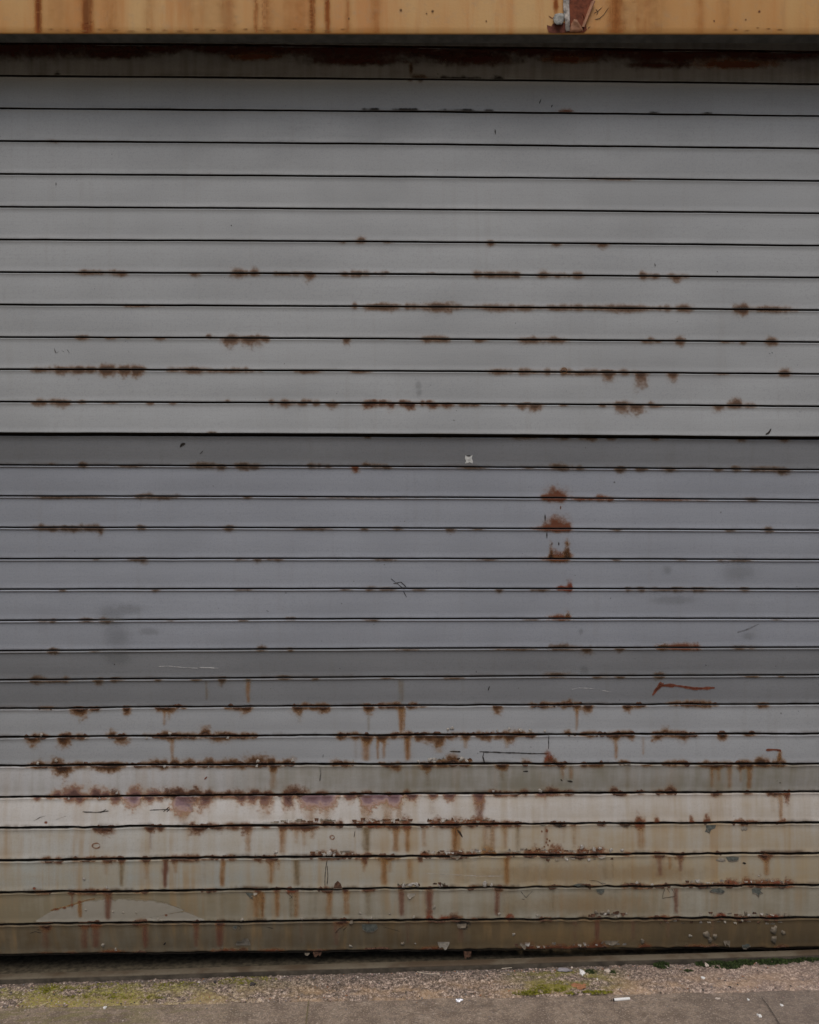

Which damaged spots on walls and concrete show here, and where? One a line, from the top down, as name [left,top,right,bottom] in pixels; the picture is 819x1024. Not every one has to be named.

corrosion [0,0,819,69]
corrosion [353,303,459,312]
corrosion [33,364,145,376]
corrosion [223,335,269,346]
corrosion [362,399,478,410]
corrosion [533,487,613,562]
corrosion [24,732,86,747]
corrosion [152,728,257,741]
corrosion [336,702,537,771]
corrosion [565,729,786,794]
corrosion [29,756,606,923]
corrosion [621,851,794,922]